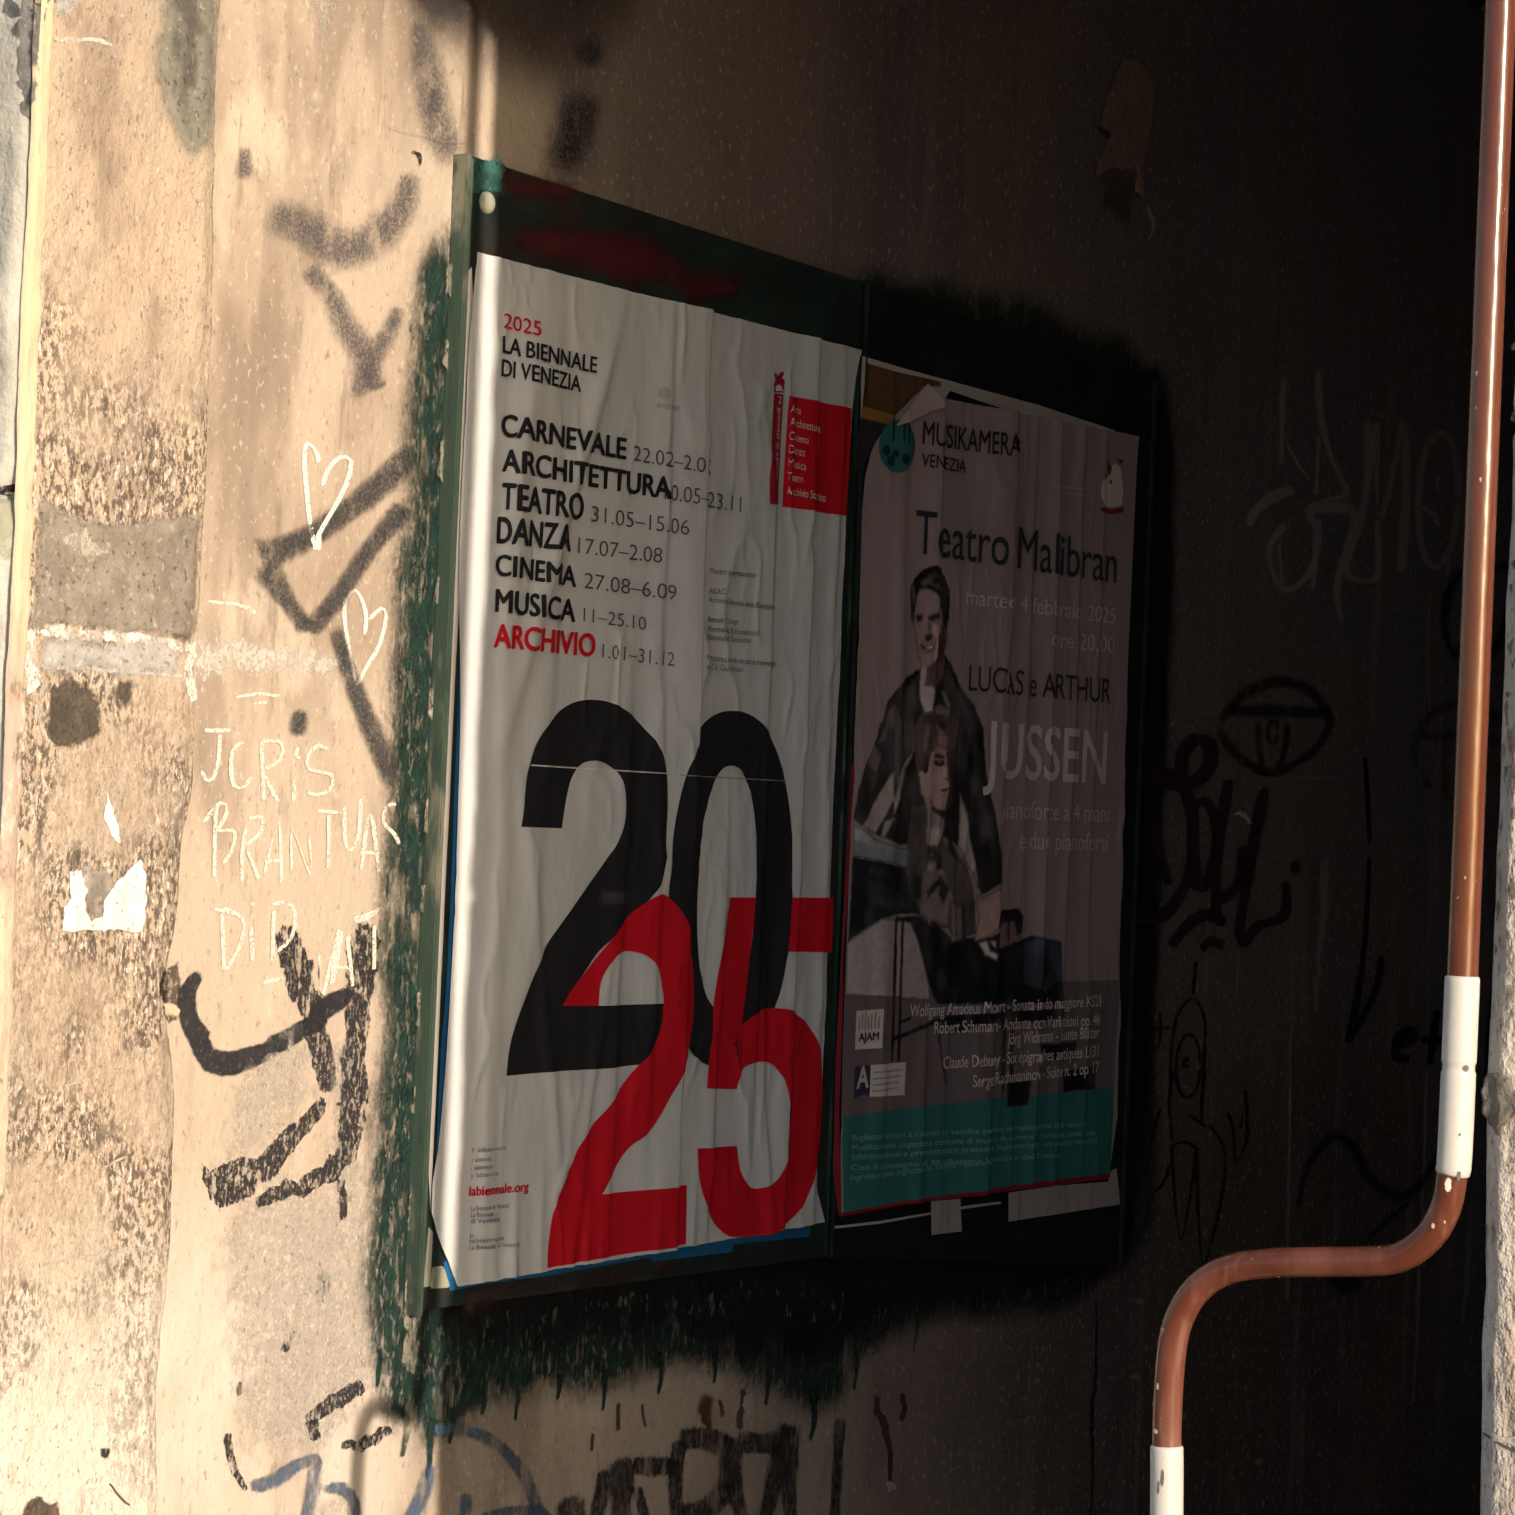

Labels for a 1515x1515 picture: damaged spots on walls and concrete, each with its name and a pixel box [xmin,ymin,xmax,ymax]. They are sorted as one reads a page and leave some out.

spalling [23,1497,59,1515]